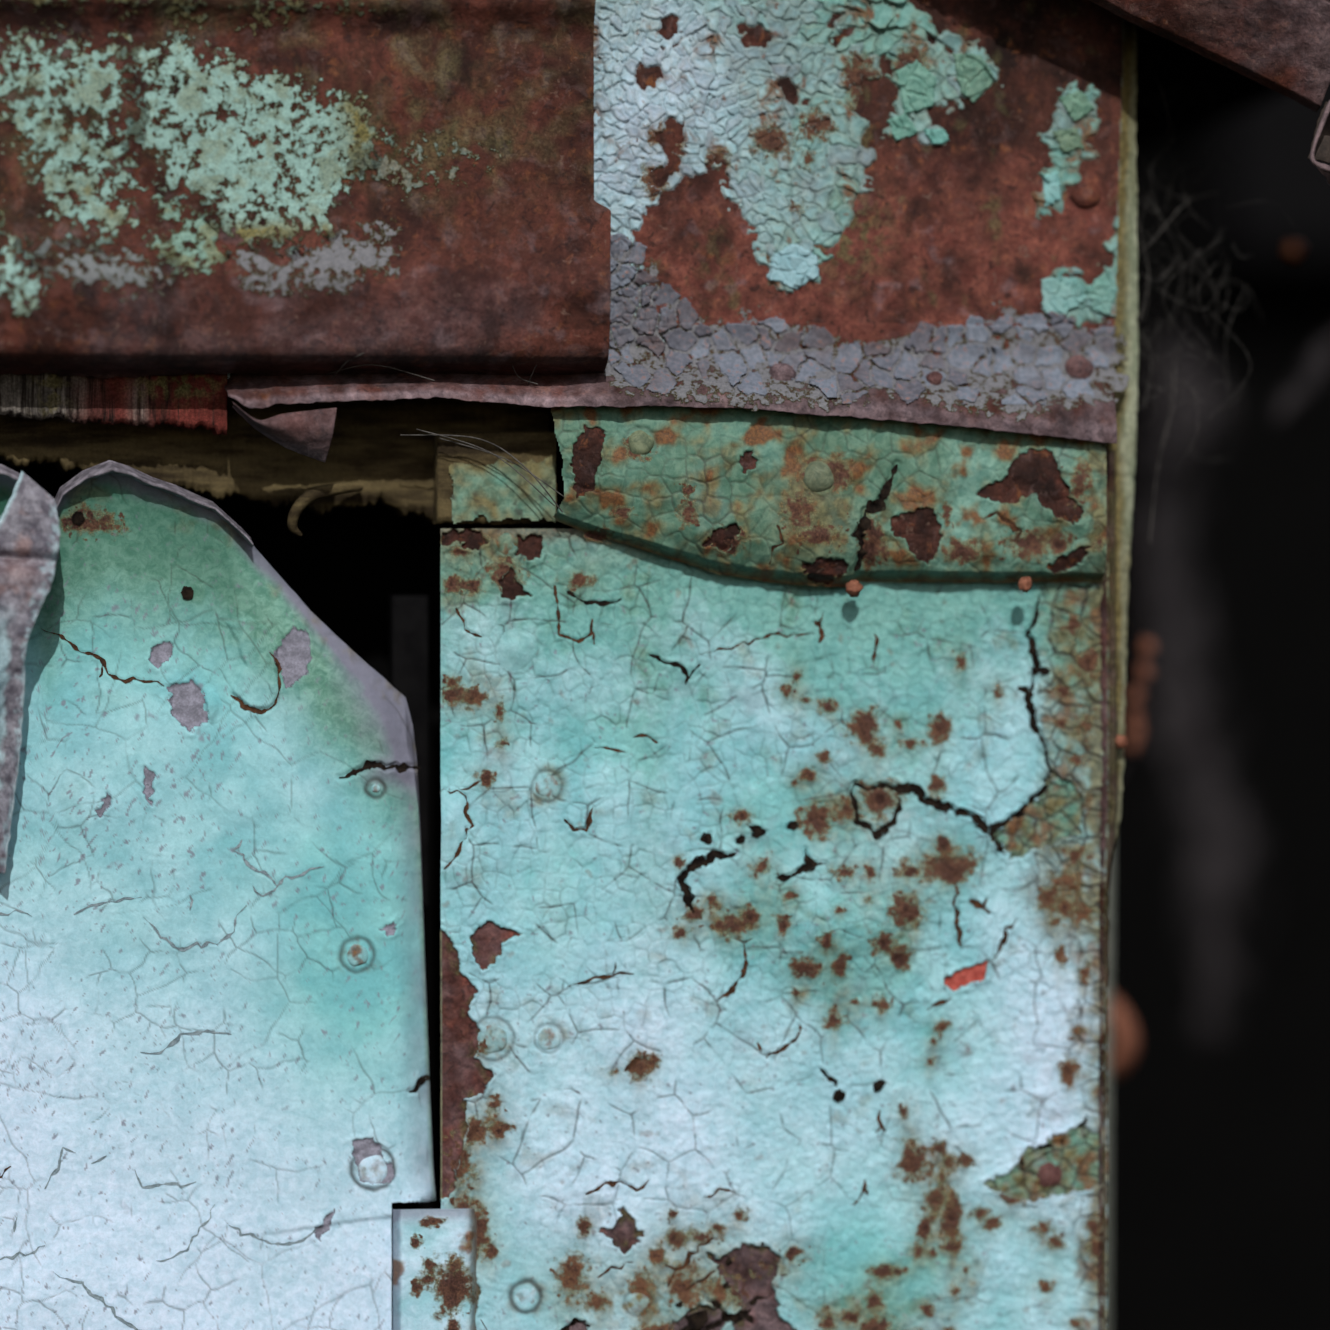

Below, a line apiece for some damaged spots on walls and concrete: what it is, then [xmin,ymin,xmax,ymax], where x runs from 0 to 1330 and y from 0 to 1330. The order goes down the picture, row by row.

peeling [603,0,1130,423]
crack [42,629,164,686]
peeling [167,679,209,732]
crack [339,760,482,869]
crack [677,821,825,913]
rust [780,670,951,841]
rust [830,835,983,972]
crack [850,597,1053,855]
peeling [944,960,988,991]
rust [410,1093,516,1330]
rust [816,1137,1065,1330]
peeling [985,1125,1103,1203]